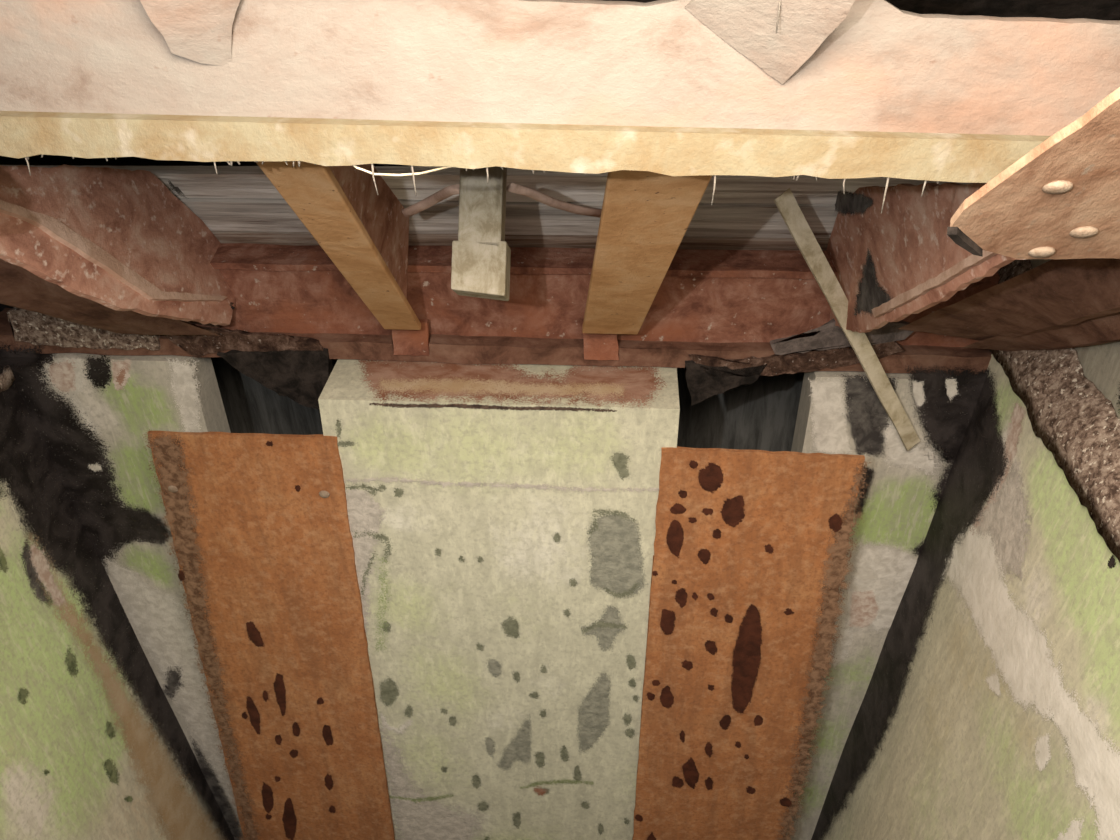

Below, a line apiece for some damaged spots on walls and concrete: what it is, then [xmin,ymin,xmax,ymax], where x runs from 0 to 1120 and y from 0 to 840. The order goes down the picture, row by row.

corrosion [354,360,667,410]
leakage [666,460,745,564]
leakage [0,382,235,840]
leakage [246,621,264,647]
leakage [660,580,763,730]
leakage [811,369,1014,840]
leakage [241,674,300,758]
leakage [261,776,297,840]
leakage [322,725,333,747]
leakage [324,773,334,790]
leakage [647,680,674,708]
leakage [671,742,714,790]